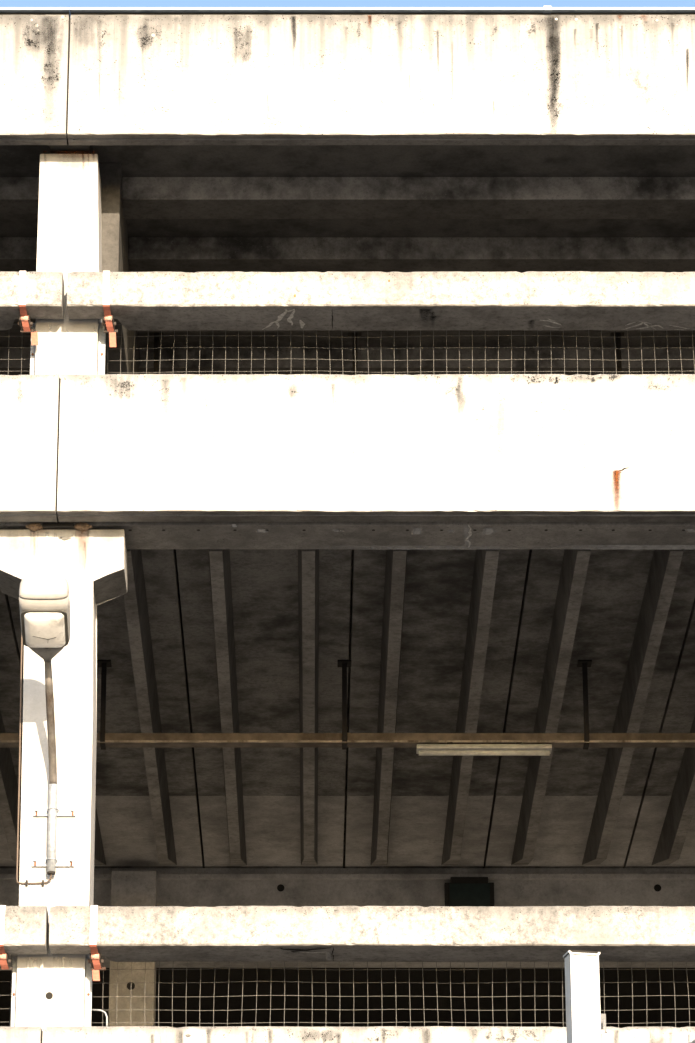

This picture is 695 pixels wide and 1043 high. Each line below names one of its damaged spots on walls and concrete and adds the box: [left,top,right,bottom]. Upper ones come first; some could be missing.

leakage [39,18,60,101]
leakage [546,18,563,117]